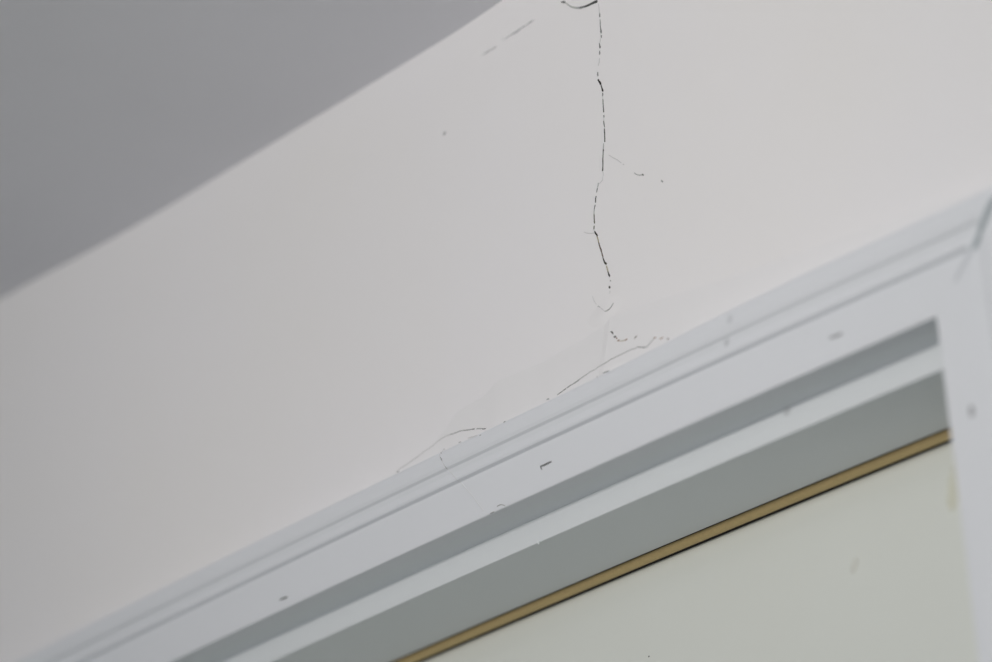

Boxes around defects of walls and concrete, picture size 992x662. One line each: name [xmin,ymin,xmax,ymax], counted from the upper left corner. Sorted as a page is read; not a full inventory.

crack [561,0,663,311]
crack [557,339,654,395]
crack [396,428,486,511]